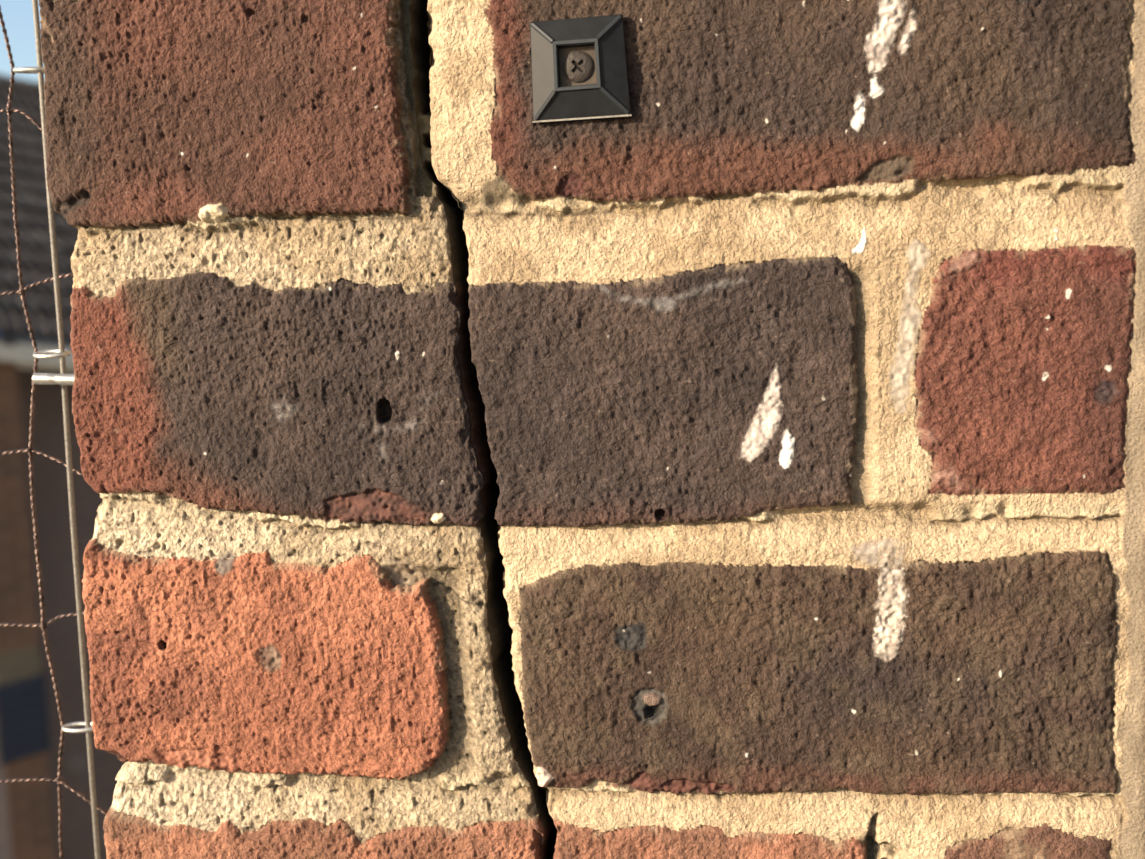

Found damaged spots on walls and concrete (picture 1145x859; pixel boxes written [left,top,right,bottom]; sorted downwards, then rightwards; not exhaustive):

crack [273,214,344,222]
crack [409,0,558,859]